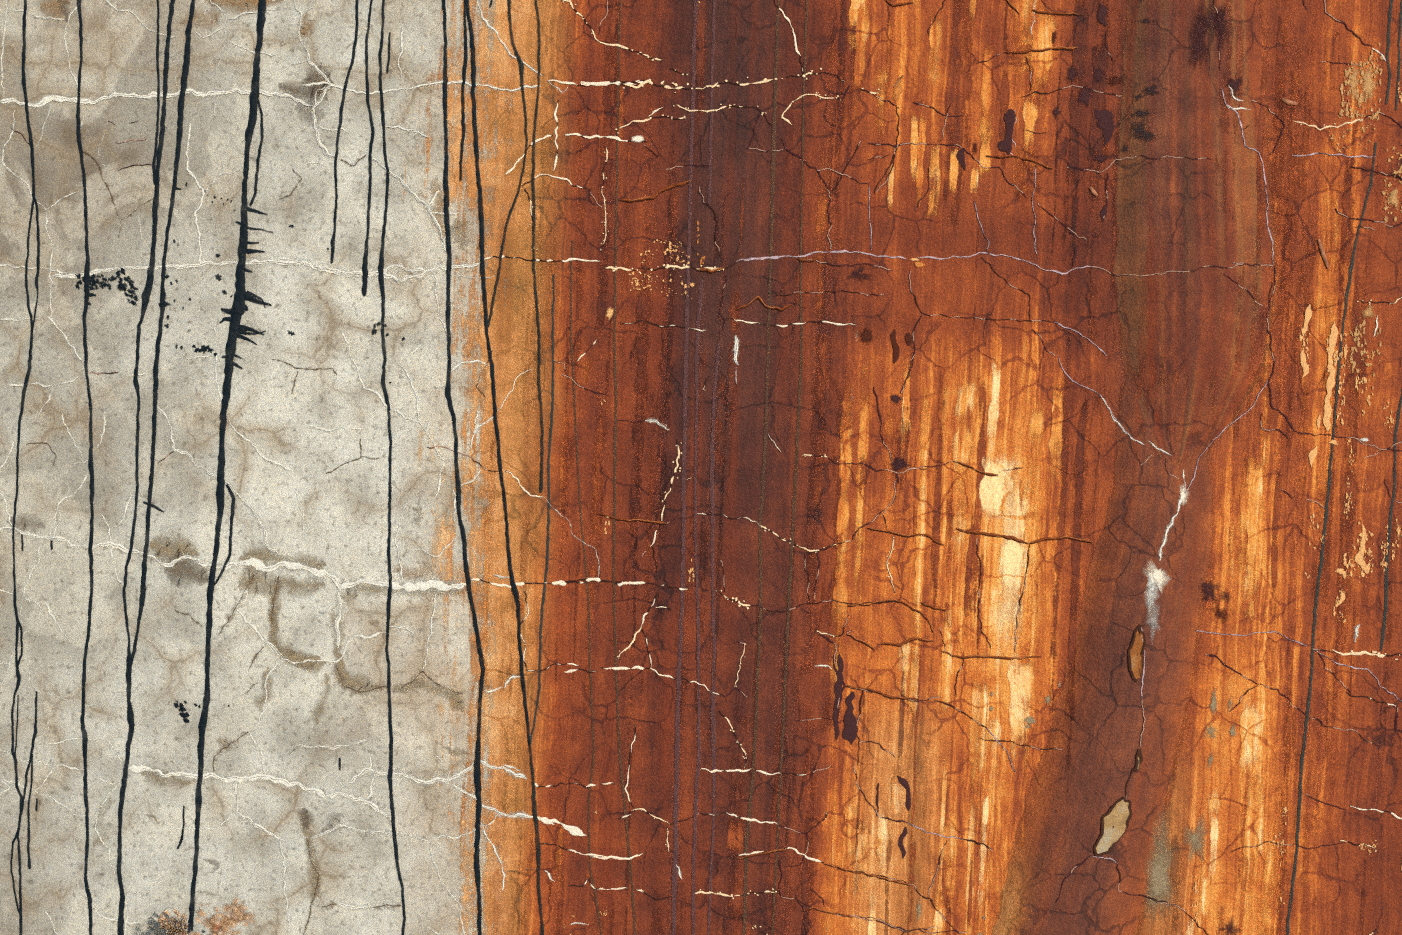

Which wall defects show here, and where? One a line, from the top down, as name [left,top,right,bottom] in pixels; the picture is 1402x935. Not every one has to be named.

leakage [280,74,331,118]
crack [0,0,1402,561]
corrosion [423,0,1129,935]
corrosion [1134,0,1402,935]
leakage [150,540,209,583]
leakage [239,551,463,712]
crack [0,331,1091,935]
spalling [1128,624,1146,682]
crack [1195,624,1402,746]
leakage [303,808,320,897]
spalling [1093,796,1132,857]
crack [1231,794,1402,852]